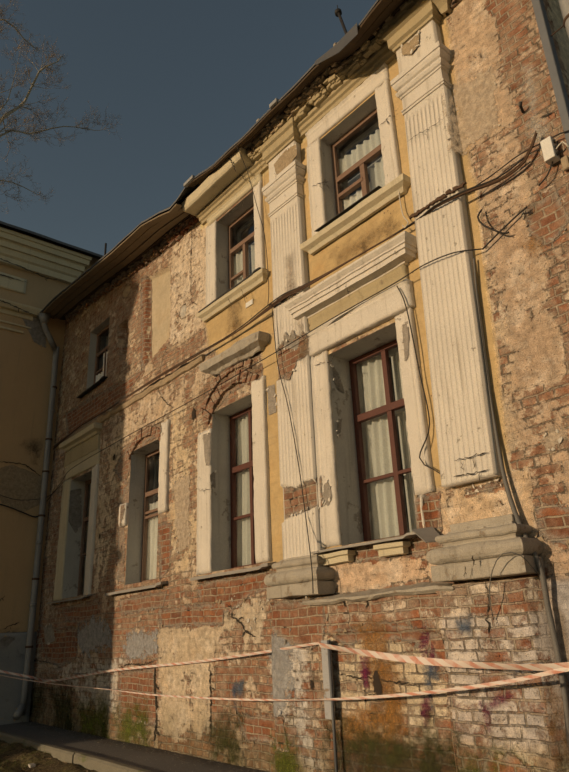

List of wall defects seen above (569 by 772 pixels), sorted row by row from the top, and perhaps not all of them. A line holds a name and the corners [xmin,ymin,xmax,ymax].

peeling [442,66,501,156]
spalling [521,187,569,248]
spalling [65,215,199,436]
spalling [266,330,309,415]
peeling [400,321,409,361]
peeling [542,423,567,453]
spalling [284,476,332,518]
spalling [38,570,269,726]
crack [226,604,256,640]
crack [118,661,159,745]